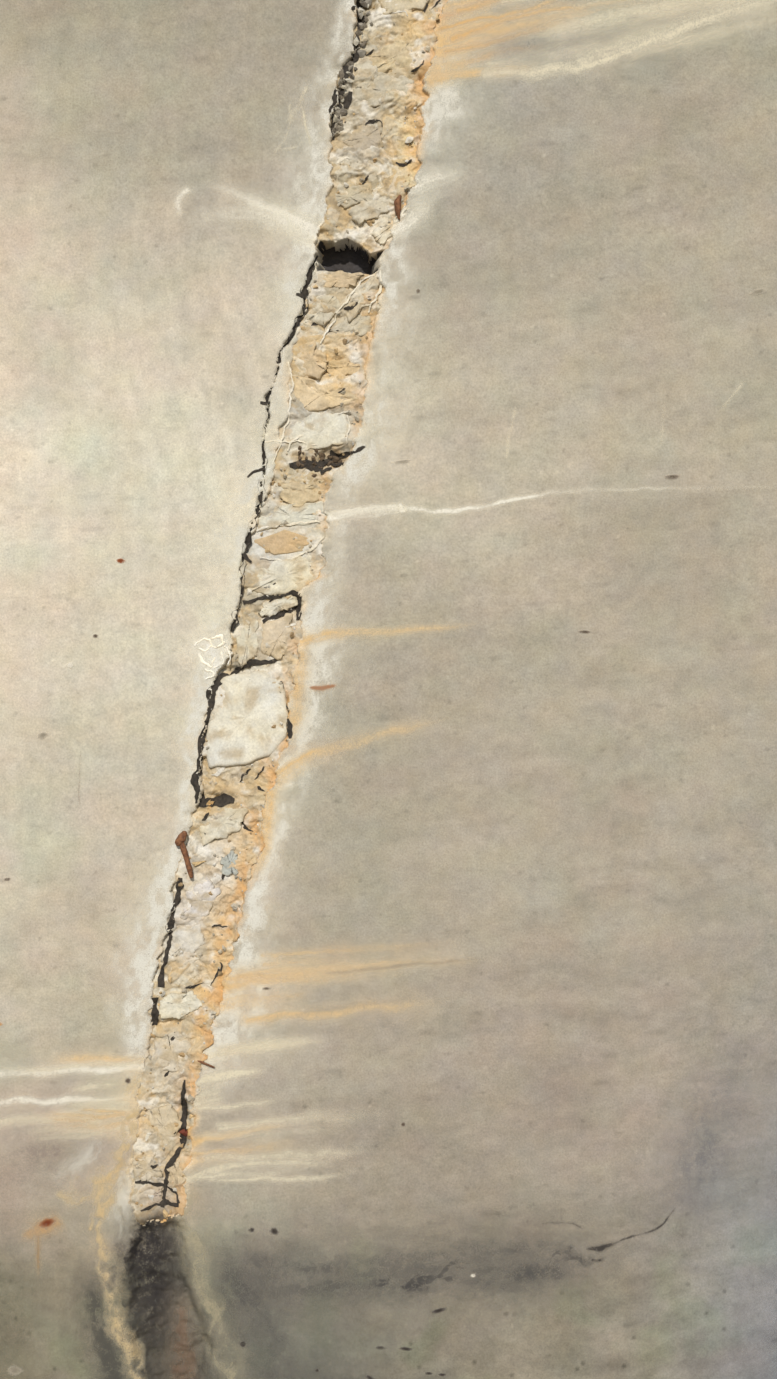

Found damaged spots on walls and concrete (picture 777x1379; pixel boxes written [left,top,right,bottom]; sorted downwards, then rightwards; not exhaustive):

crack [328,0,365,140]
rust [425,0,773,86]
crack [190,255,365,807]
spalling [125,0,449,1225]
crack [150,878,184,1026]
crack [135,1080,188,1212]
damp [79,1166,593,1379]